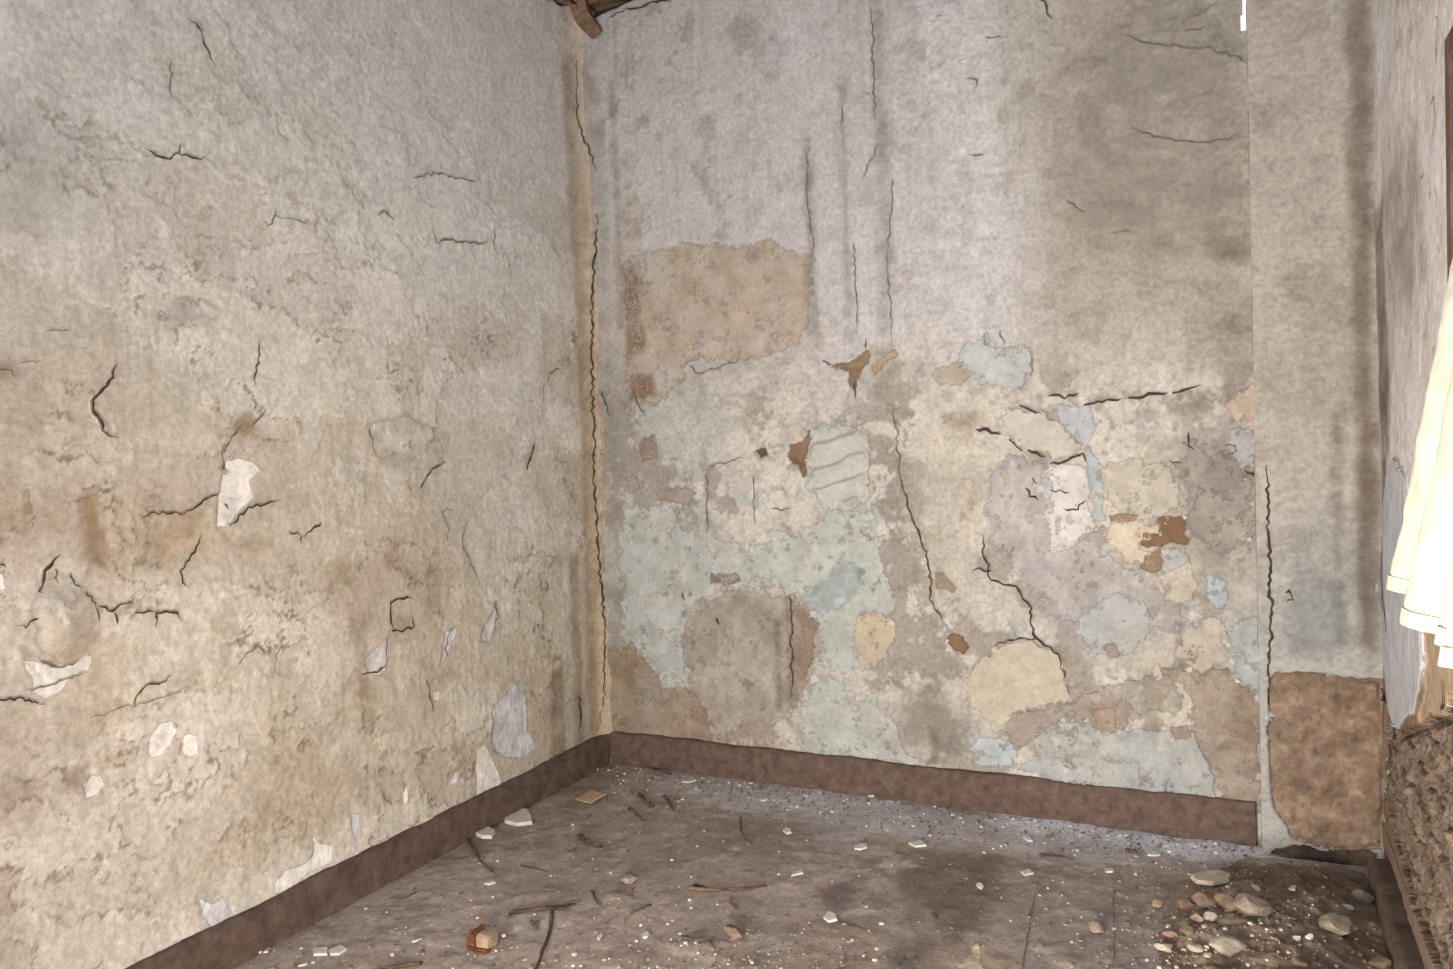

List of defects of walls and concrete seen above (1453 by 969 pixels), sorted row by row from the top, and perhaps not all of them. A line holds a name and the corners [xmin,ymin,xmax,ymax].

peeling [22,654,92,700]
crack [0,344,321,705]
peeling [217,458,259,527]
crack [542,213,646,731]
peeling [618,239,816,406]
peeling [613,422,927,766]
crack [892,407,949,630]
crack [973,533,1070,693]
crack [976,331,1199,511]
spalling [932,333,1453,969]
crack [1169,434,1294,723]
peeling [274,837,332,894]